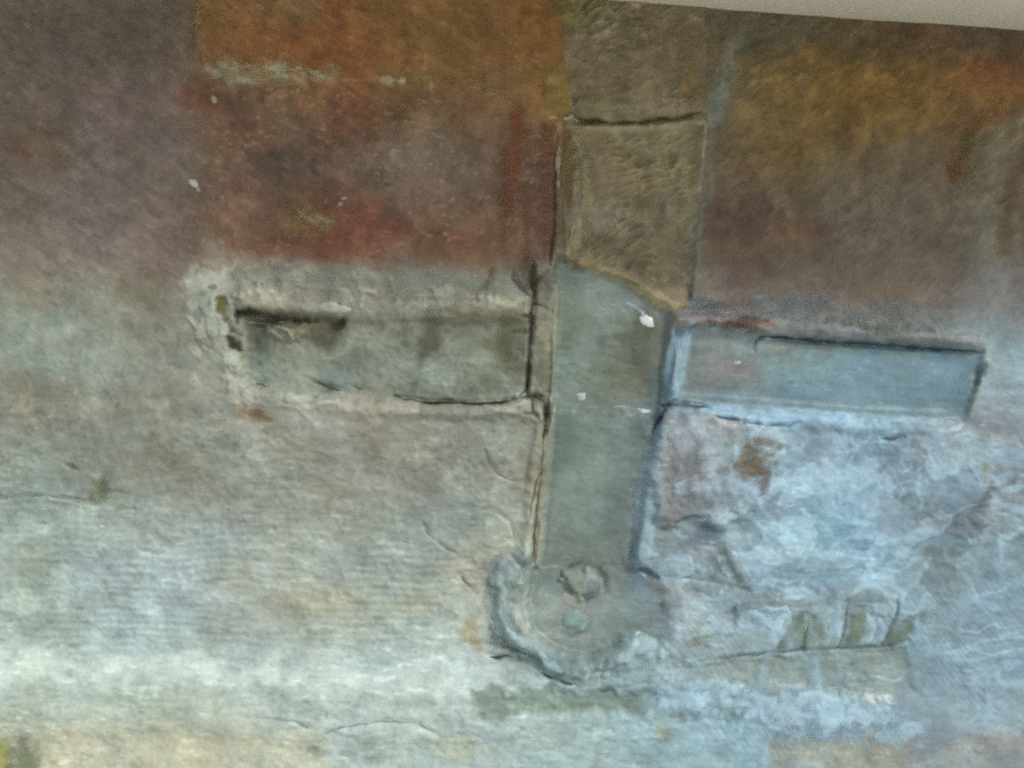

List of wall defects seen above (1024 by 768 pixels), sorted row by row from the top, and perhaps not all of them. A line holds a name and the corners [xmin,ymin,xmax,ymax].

spalling [216,296,280,351]
crack [396,149,557,558]
corrosion [730,438,782,493]